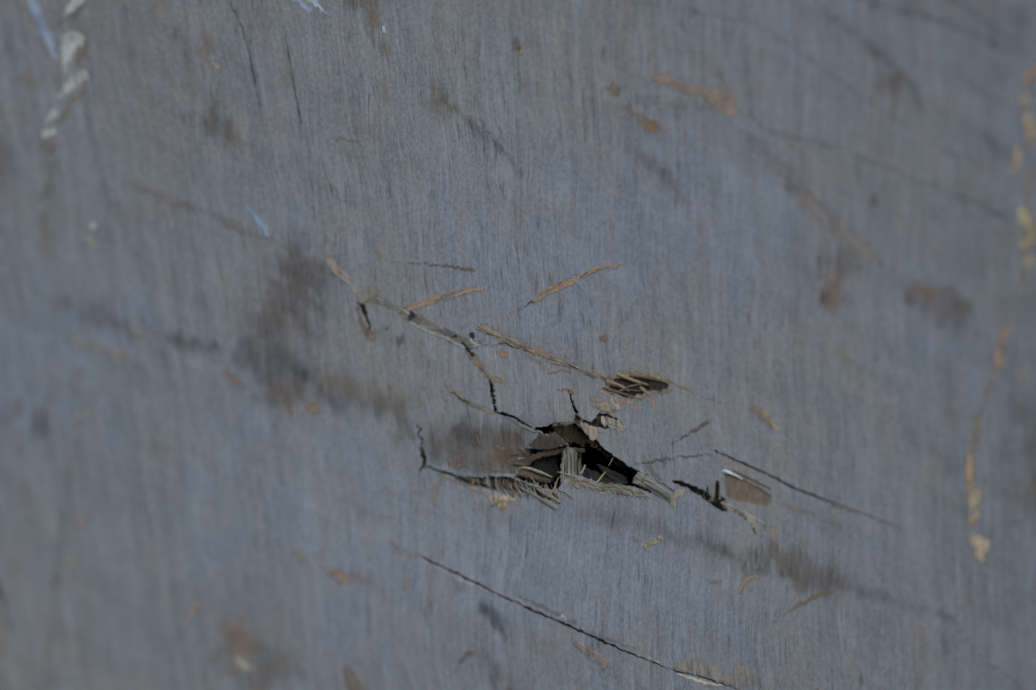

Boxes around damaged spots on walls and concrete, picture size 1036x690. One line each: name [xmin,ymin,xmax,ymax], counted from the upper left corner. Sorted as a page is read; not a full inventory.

peeling [65,0,88,18]
peeling [41,30,89,139]
peeling [1011,63,1036,281]
crack [356,285,518,414]
crack [417,395,501,508]
crack [567,389,583,423]
crack [673,450,869,541]
peeling [966,320,1011,564]
crack [400,548,741,690]